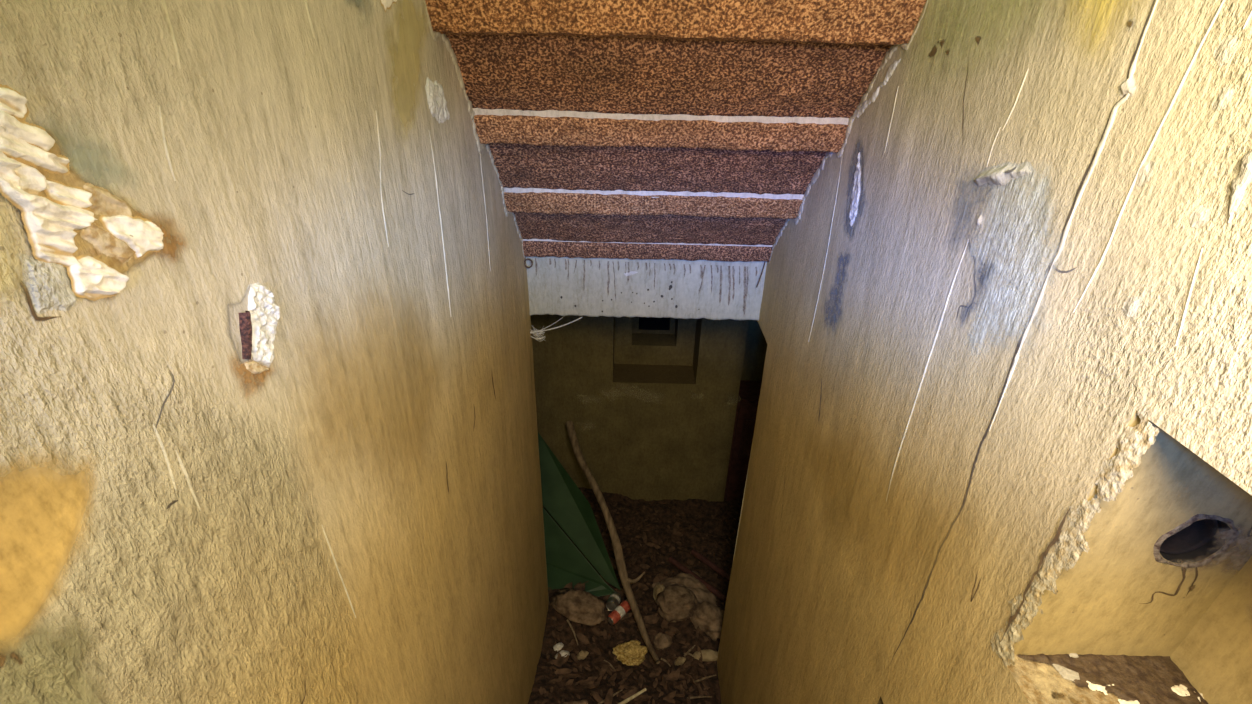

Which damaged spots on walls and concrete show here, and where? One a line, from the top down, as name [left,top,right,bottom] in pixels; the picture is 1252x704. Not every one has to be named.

flaking render [0,84,164,315]
spalling [228,282,280,390]
crack [889,0,1158,666]
leakage [0,466,97,704]
flaking render [990,406,1159,667]
flaking render [1029,653,1140,704]
peeling [1171,684,1203,702]